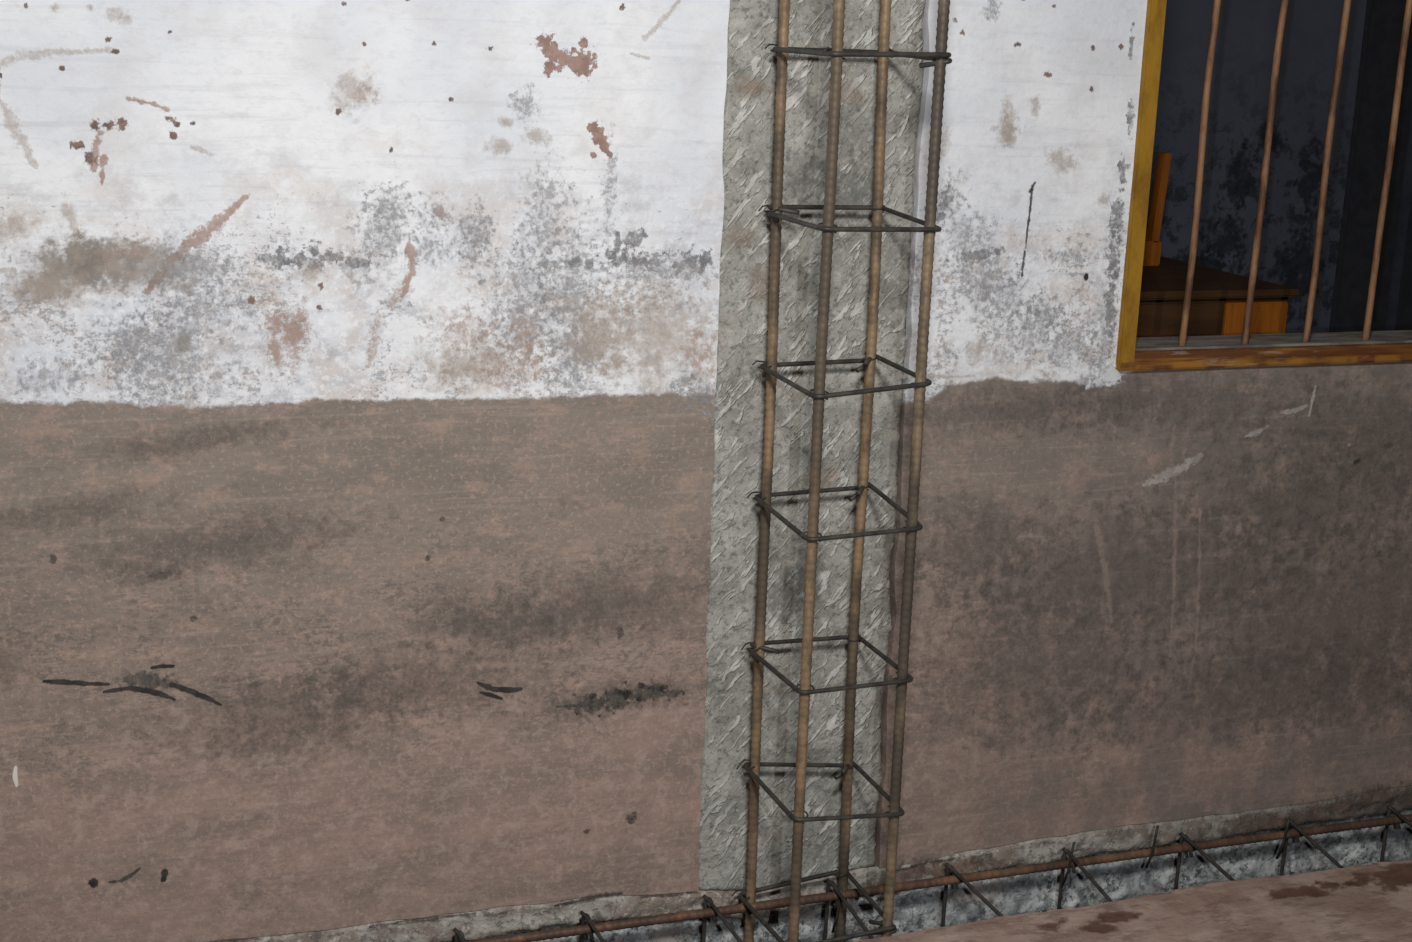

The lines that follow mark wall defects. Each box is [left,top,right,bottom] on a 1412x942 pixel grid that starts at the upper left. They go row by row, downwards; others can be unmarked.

peeling [70,118,127,185]
peeling [127,97,195,139]
leakage [15,195,249,302]
leakage [389,243,418,307]
peeling [13,358,80,396]
peeling [91,279,309,416]
leakage [430,306,543,386]
leakage [576,289,716,379]
spalling [228,0,834,942]
spalling [798,0,1412,942]
spalling [43,664,222,706]